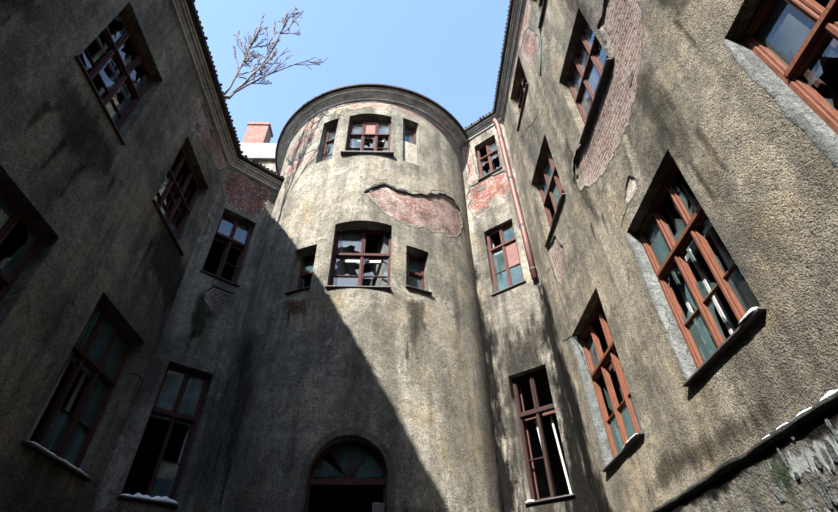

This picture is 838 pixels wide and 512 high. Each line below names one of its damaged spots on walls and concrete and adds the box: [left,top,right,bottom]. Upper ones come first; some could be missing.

water stain [32,83,114,193]
flaking render [221,167,273,220]
flaking render [285,101,510,239]
flaking render [575,0,644,192]
flaking render [623,173,638,205]
water stain [478,282,613,512]
water stain [656,417,753,486]
water stain [663,437,790,512]
peeling [767,418,838,512]
water stain [797,404,838,440]